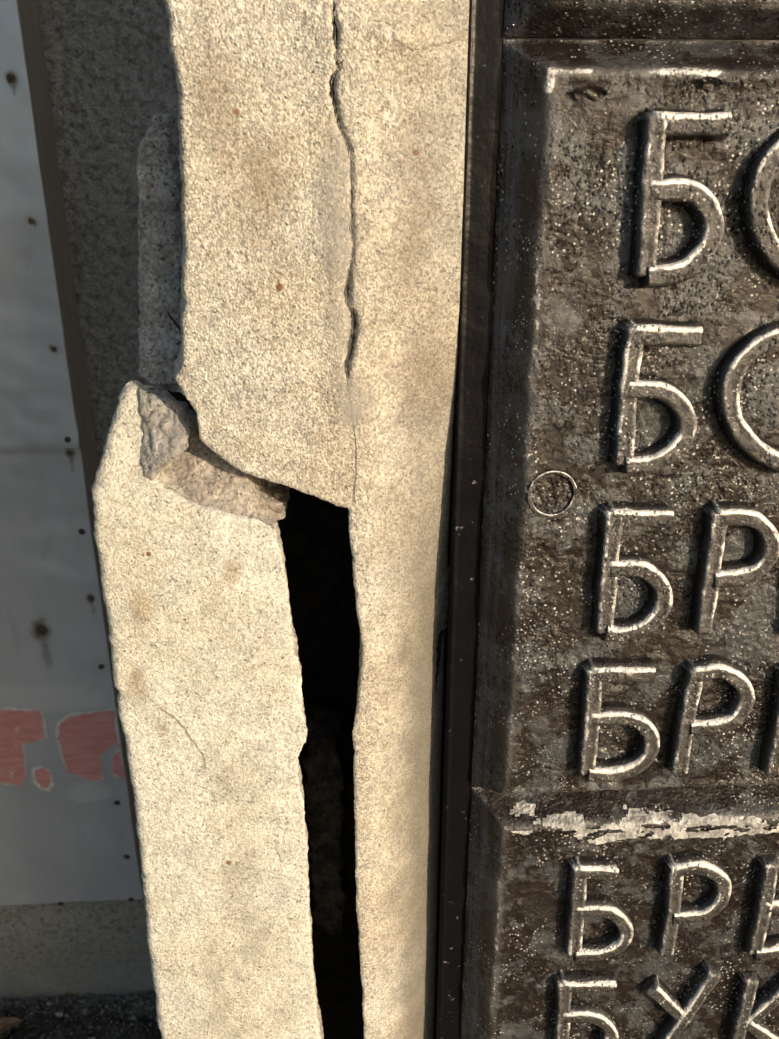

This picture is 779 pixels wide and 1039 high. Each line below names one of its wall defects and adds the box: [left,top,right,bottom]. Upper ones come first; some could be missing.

spalling [136,80,291,522]
crack [329,1,358,523]
crack [181,493,363,1039]